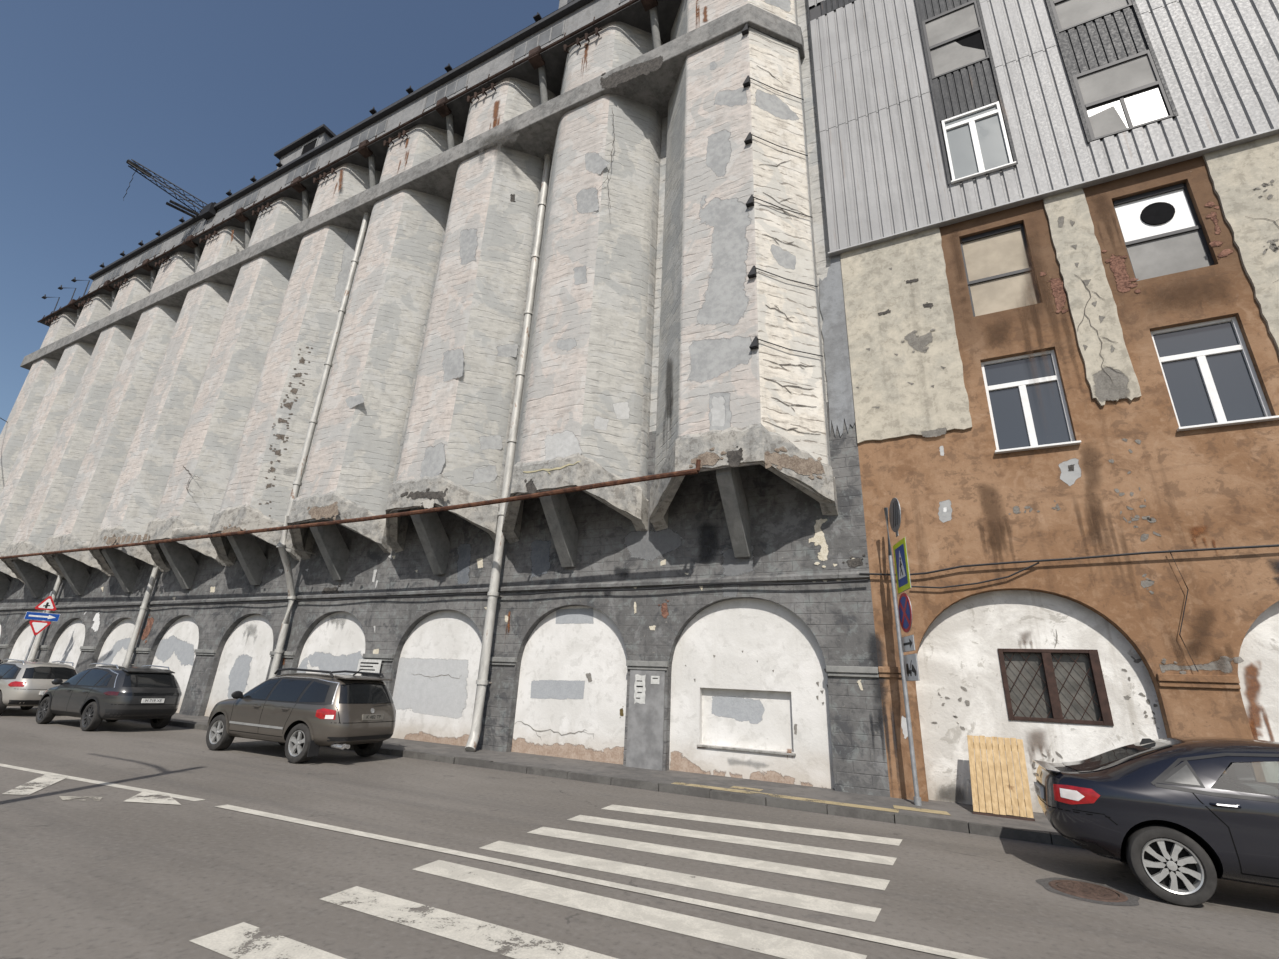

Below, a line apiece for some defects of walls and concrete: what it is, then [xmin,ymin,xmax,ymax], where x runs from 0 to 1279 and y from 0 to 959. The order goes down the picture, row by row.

corrosion [489,101,499,129]
crack [759,160,806,248]
peeling [687,196,752,431]
peeling [895,329,936,356]
crack [1075,275,1123,382]
spalling [259,347,313,516]
spalling [689,446,743,468]
crack [763,359,817,435]
peeling [1093,367,1130,402]
peeling [809,519,868,582]